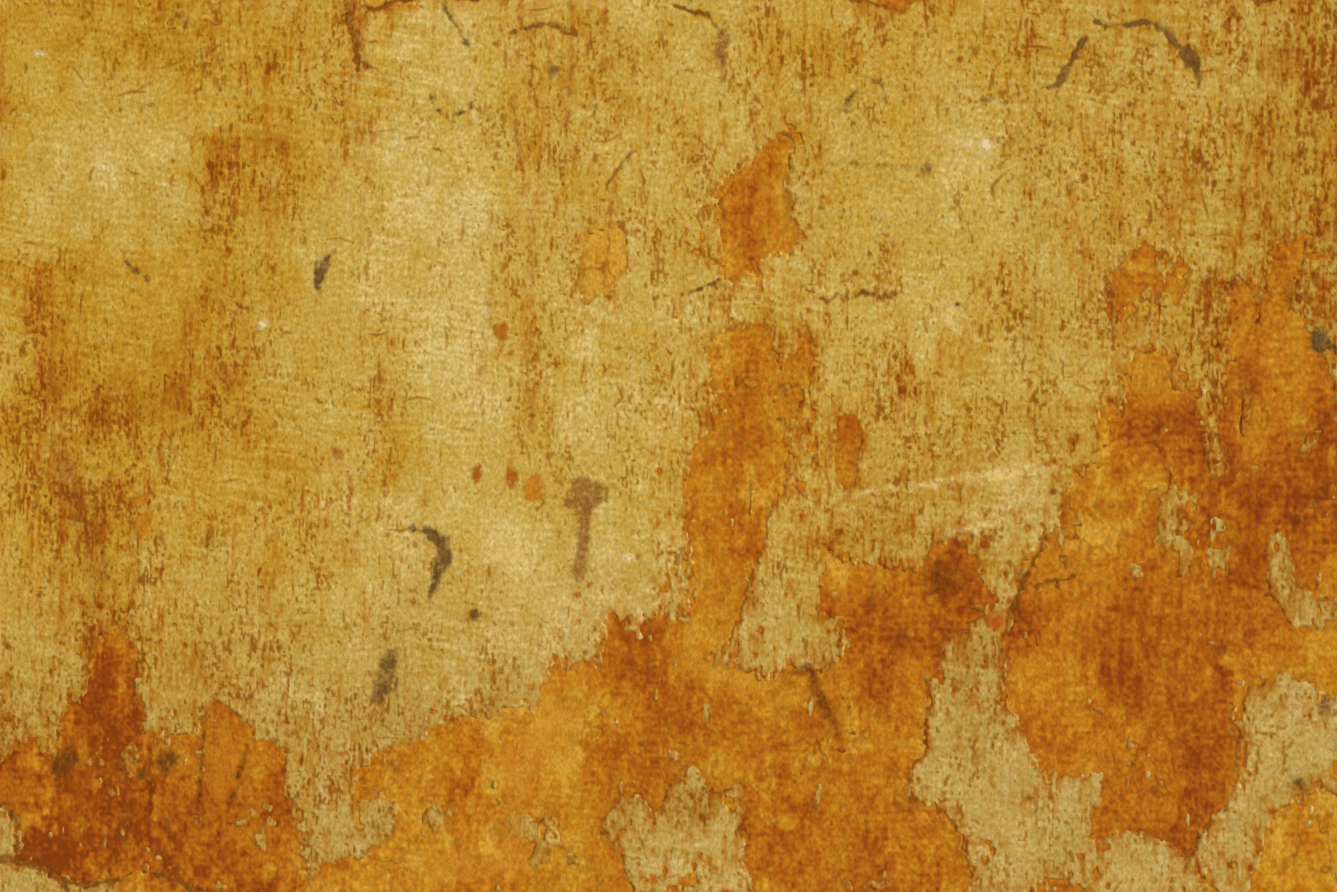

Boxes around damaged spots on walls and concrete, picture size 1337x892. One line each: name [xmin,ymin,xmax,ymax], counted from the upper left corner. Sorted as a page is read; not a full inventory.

crack [344,0,412,72]
crack [443,0,479,45]
crack [510,23,578,37]
crack [672,4,723,35]
crack [1047,19,1201,89]
peeling [695,125,820,292]
peeling [0,212,1337,892]